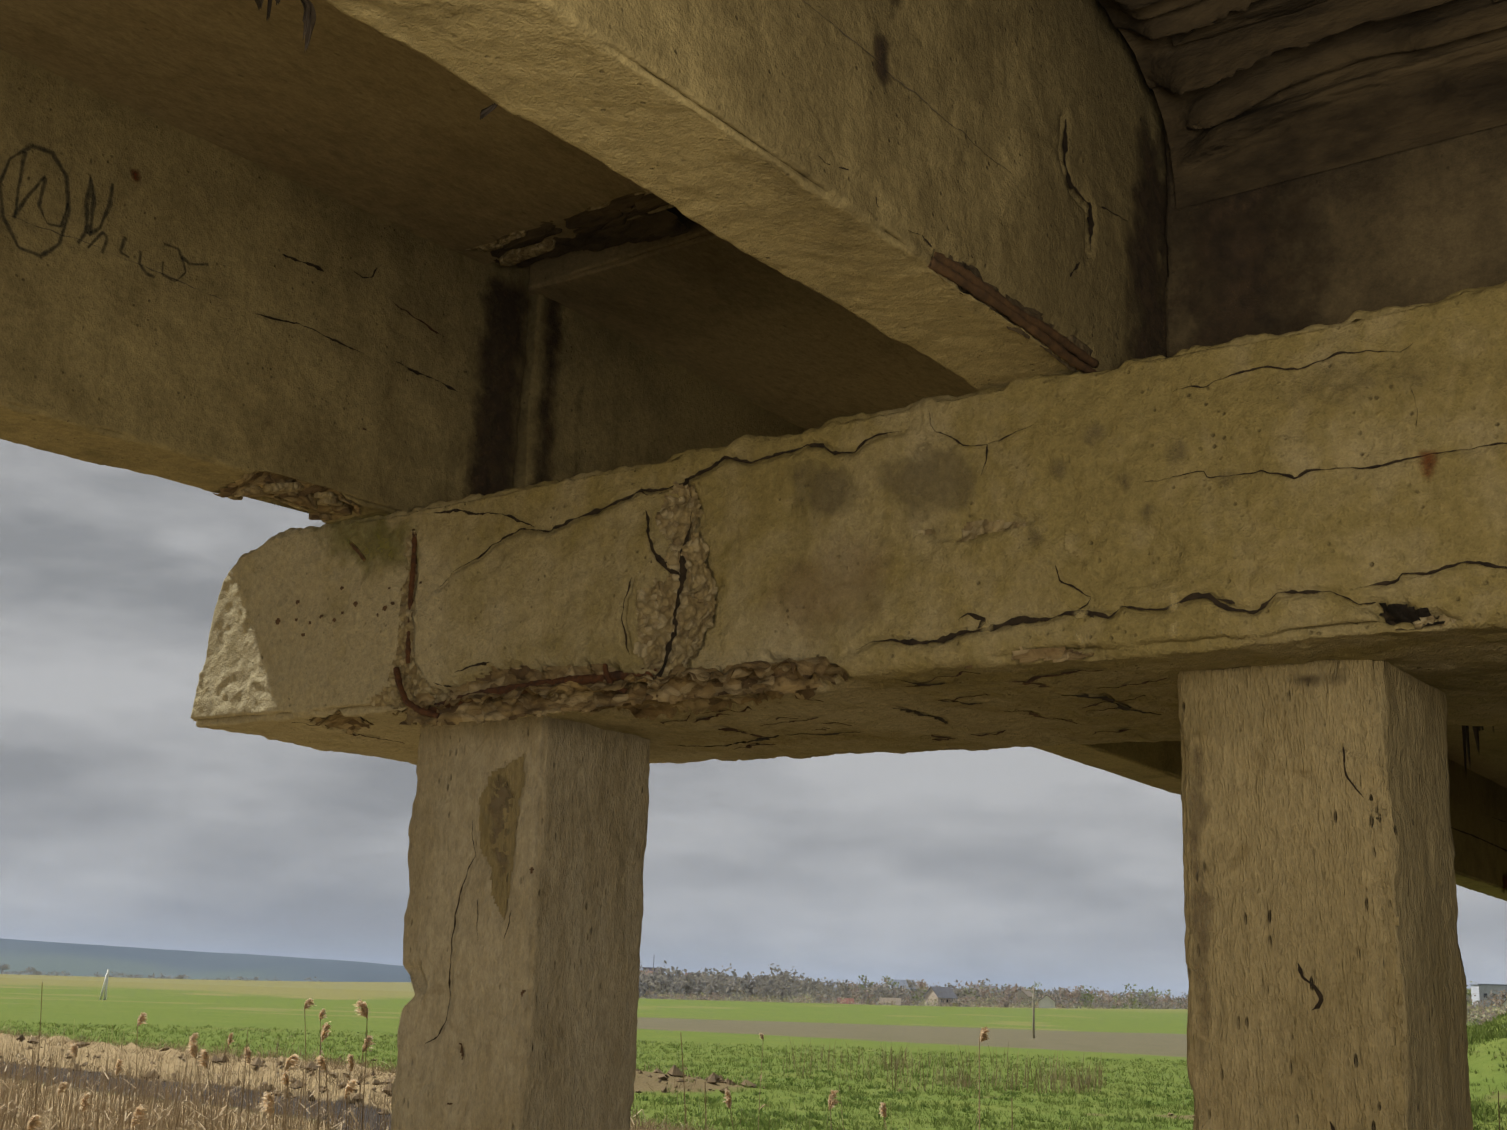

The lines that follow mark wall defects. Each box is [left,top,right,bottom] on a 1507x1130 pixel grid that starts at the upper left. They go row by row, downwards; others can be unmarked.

crack [1062,120,1128,277]
spalling [213,471,361,521]
leakage [470,280,528,496]
leakage [536,300,561,484]
crack [435,413,1030,586]
crack [1174,344,1412,391]
crack [1145,389,1507,482]
spalling [309,481,848,735]
crack [660,695,860,749]
crack [857,561,1507,741]
spalling [1379,603,1456,630]
crack [426,821,511,1043]